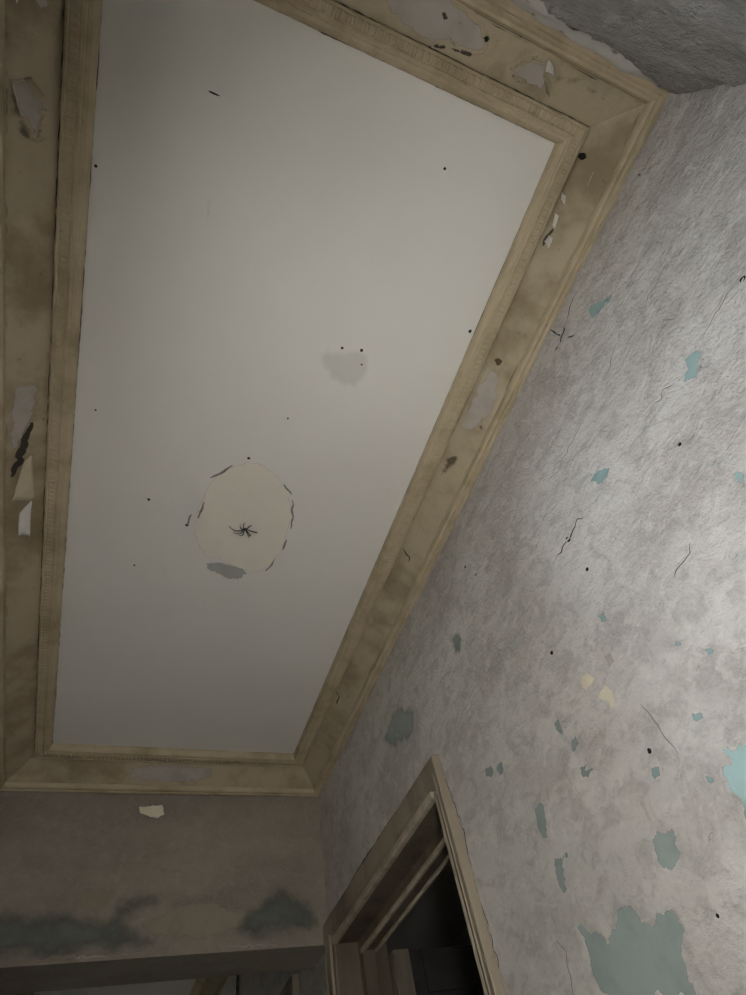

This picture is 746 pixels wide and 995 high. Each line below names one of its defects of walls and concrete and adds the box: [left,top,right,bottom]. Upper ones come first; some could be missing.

peeling [380,0,490,56]
peeling [506,55,555,97]
peeling [447,366,502,455]
crack [551,496,599,566]
peeling [715,733,746,831]
peeling [574,897,702,995]